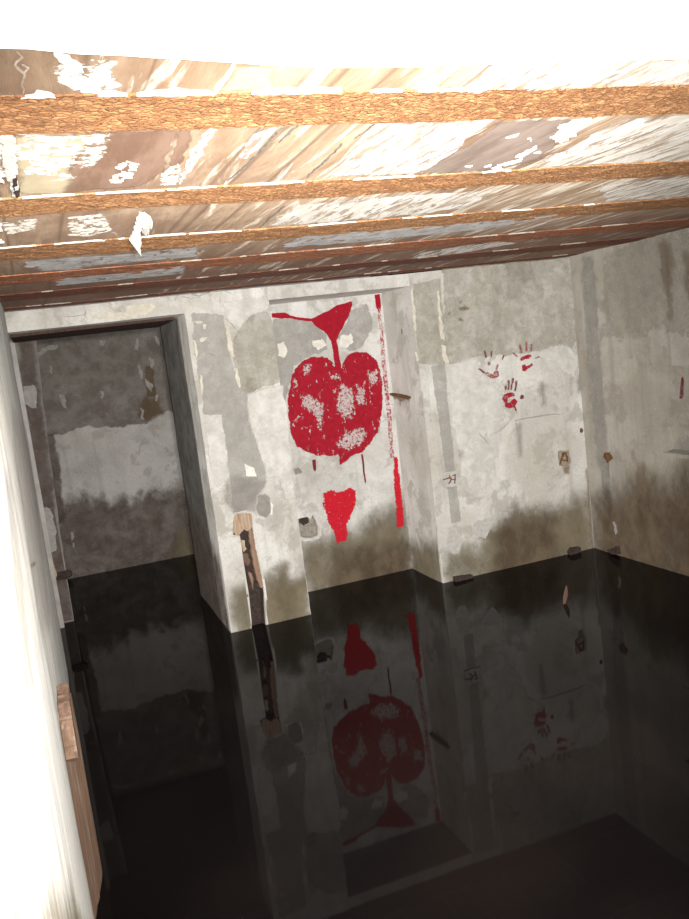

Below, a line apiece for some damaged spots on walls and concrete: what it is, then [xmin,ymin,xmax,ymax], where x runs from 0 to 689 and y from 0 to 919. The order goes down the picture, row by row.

peeling [21,52,214,99]
flaking render [251,87,343,95]
peeling [0,134,110,200]
peeling [482,115,689,173]
peeling [0,219,37,249]
peeling [25,212,242,292]
peeling [87,294,156,320]
leakage [265,232,689,625]
leakage [8,318,251,683]
peeling [192,313,327,625]